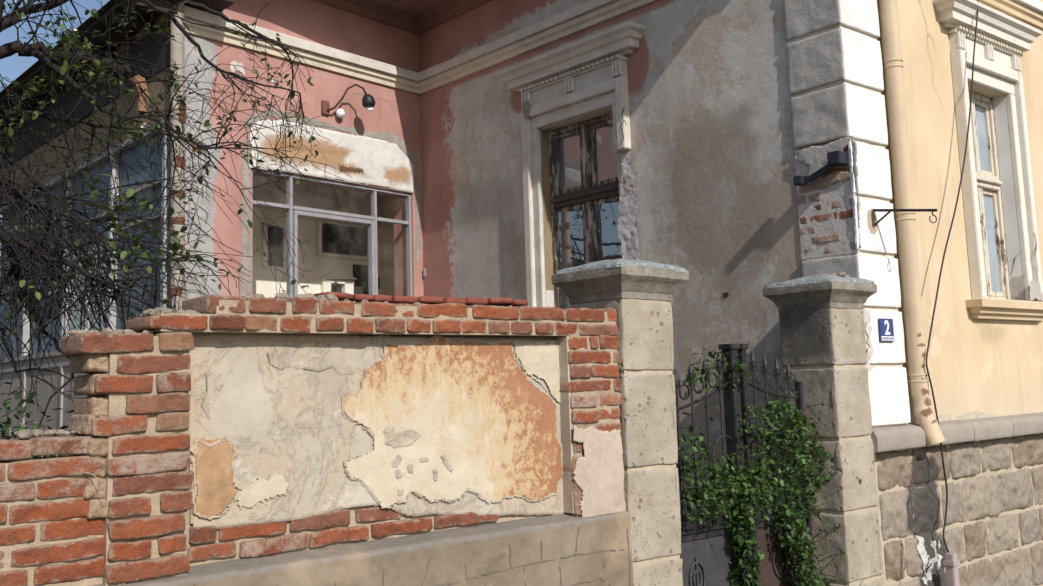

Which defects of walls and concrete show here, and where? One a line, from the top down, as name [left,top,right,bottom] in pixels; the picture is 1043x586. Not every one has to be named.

flaking render [794,137,861,260]
flaking render [190,437,290,520]
flaking render [342,335,563,509]
rust [917,333,936,424]
water stain [907,456,947,586]